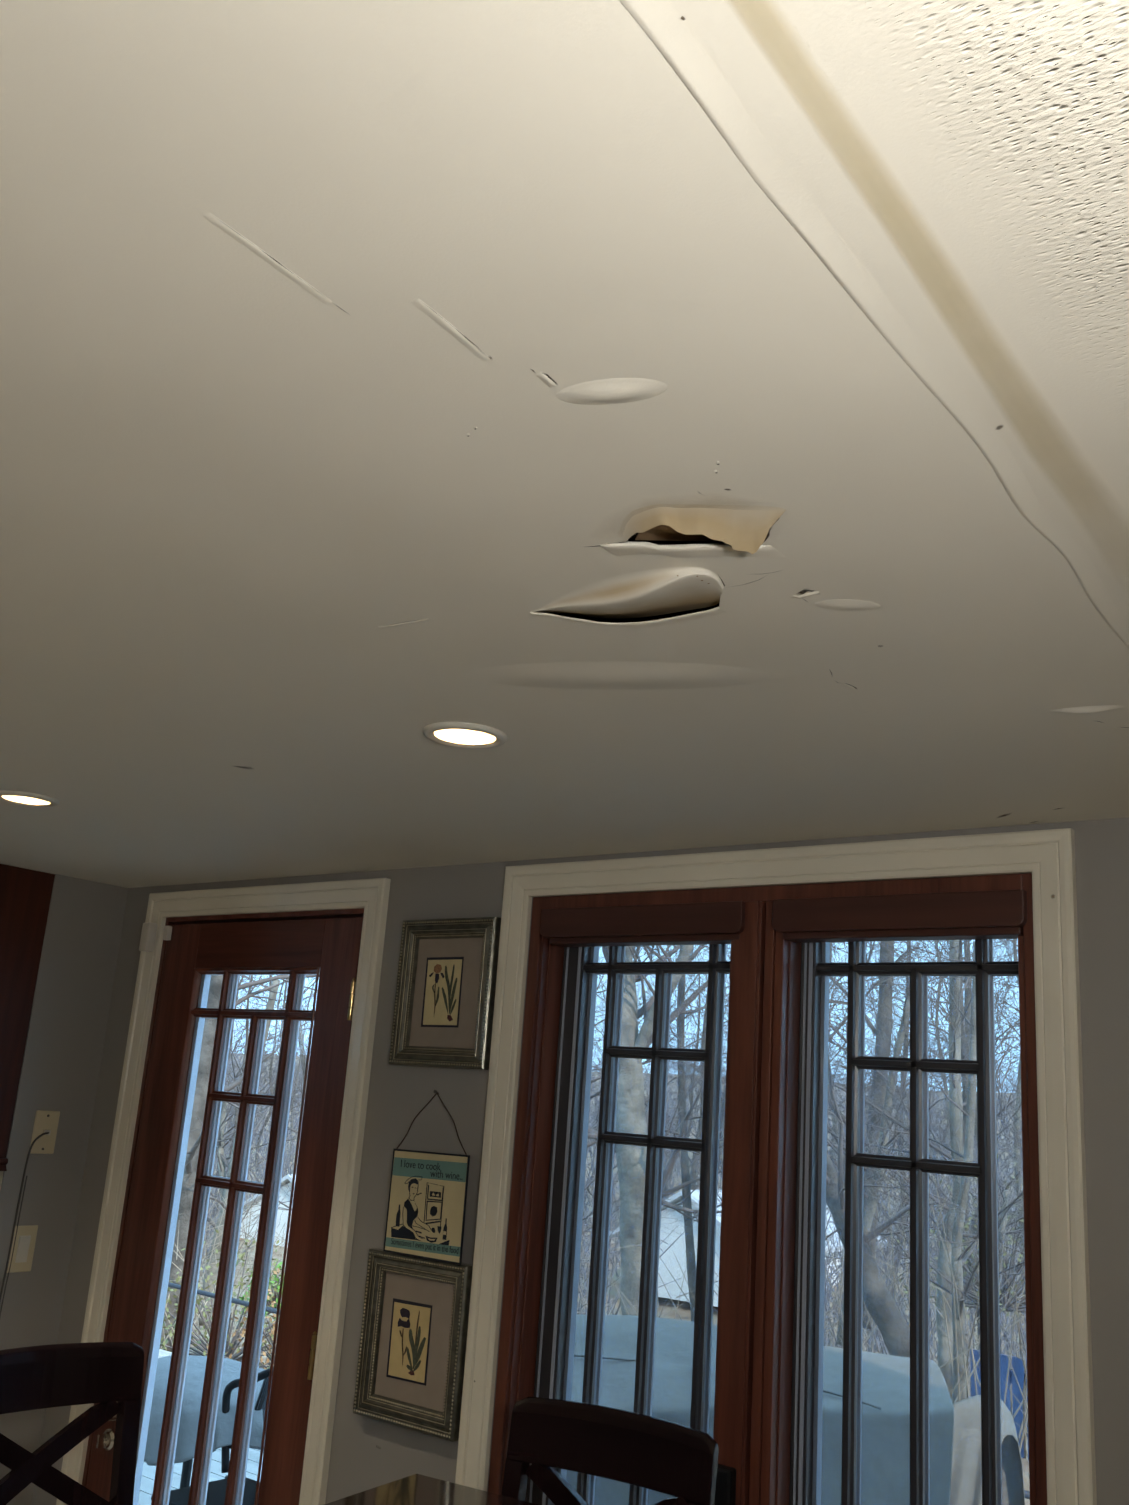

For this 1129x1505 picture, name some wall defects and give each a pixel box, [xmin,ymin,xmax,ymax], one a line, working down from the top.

crack [203,213,344,311]
crack [410,299,491,361]
crack [532,370,558,387]
spalling [628,533,727,545]
spalling [542,602,720,623]